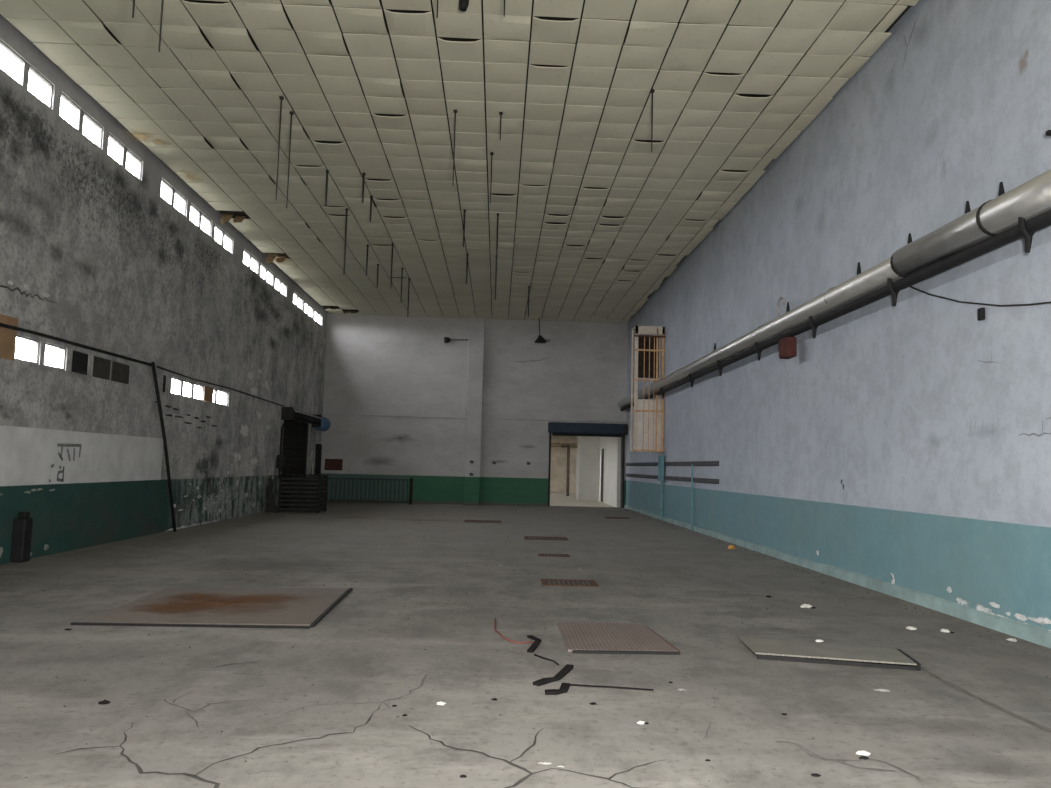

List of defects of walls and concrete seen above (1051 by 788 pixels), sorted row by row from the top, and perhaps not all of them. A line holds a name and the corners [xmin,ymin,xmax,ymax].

crack [0,285,57,304]
crack [1019,417,1051,437]
peeling [947,587,1051,631]
crack [53,667,668,788]